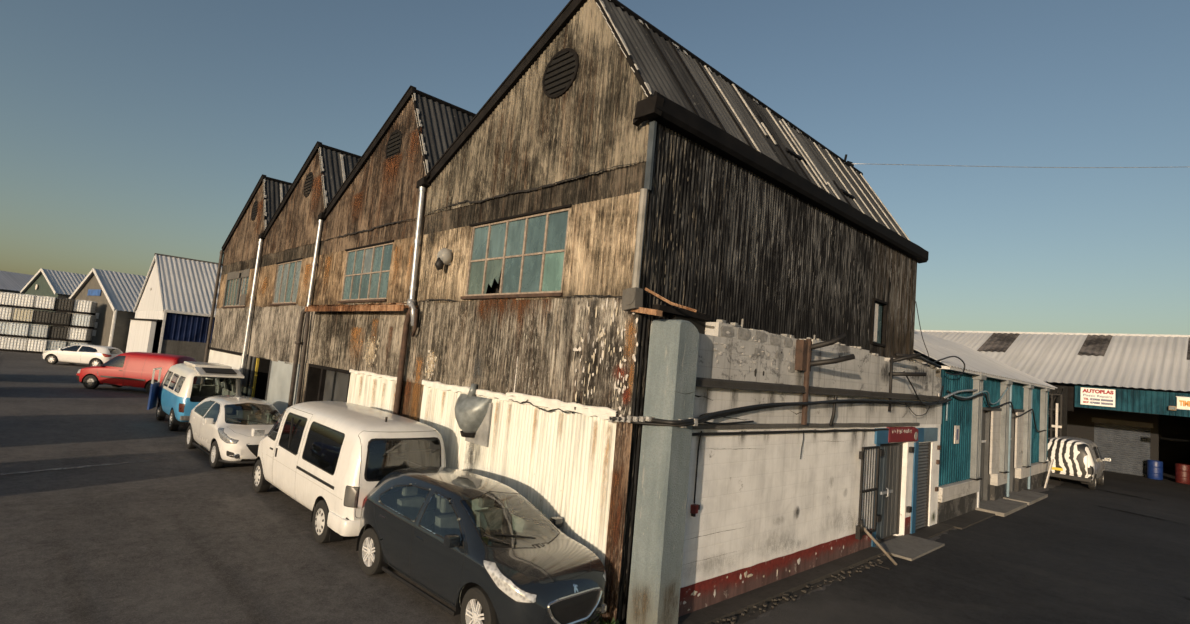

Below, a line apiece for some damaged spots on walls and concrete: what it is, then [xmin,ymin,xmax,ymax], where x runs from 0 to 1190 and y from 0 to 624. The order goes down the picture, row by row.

peeling [572,298,638,417]